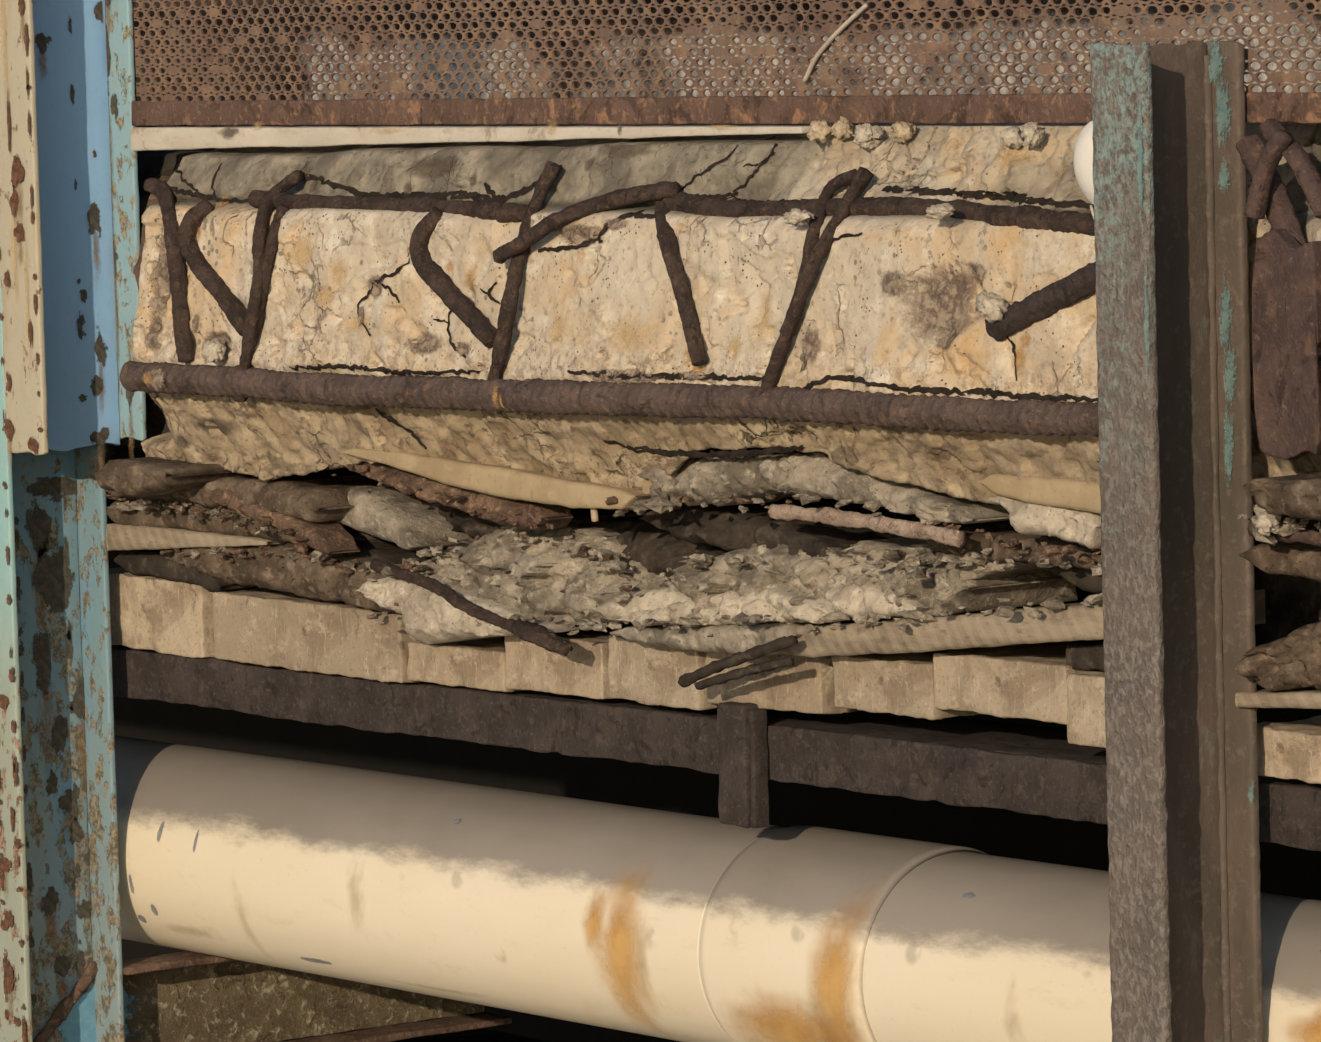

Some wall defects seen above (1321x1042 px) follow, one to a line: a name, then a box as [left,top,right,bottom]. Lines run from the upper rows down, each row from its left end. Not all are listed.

corrosion [93,0,111,77]
corrosion [7,91,24,258]
crack [681,135,802,202]
corrosion [90,326,108,396]
corrosion [87,202,118,297]
spalling [145,235,171,349]
crack [289,253,483,376]
crack [538,209,656,253]
spalling [800,328,821,372]
spalling [880,264,985,350]
corrosion [24,476,78,614]
peeling [988,495,1101,549]